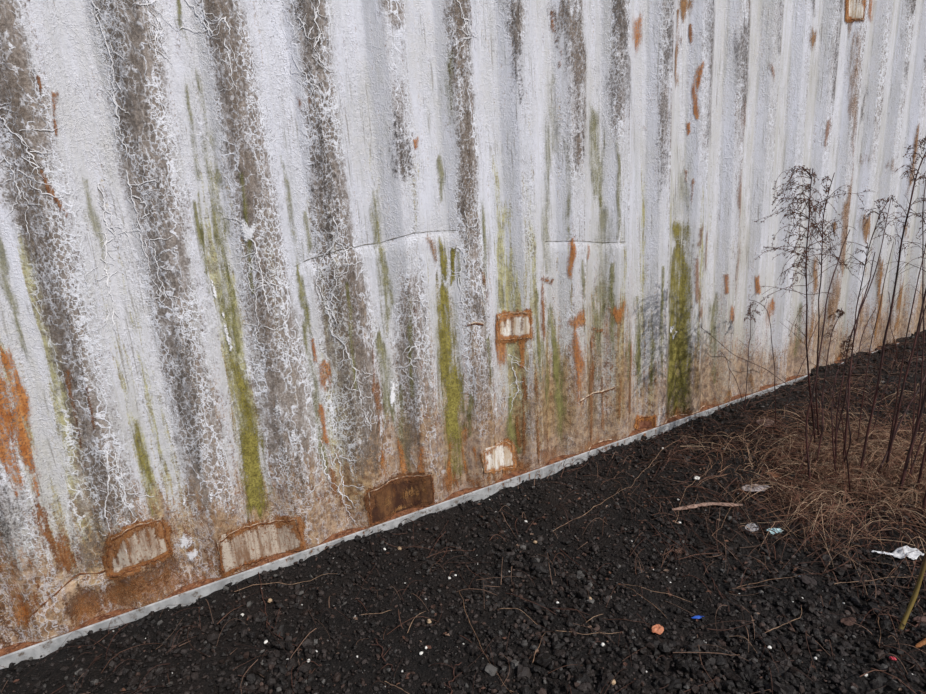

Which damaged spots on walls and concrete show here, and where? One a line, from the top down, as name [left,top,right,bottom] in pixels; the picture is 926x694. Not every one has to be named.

damp [0,45,87,443]
damp [194,193,229,272]
damp [206,0,286,391]
damp [294,0,394,476]
damp [439,237,461,285]
damp [446,0,478,244]
corrosion [686,62,704,135]
corrosion [845,0,872,148]
corrosion [0,346,81,573]
corrosion [363,276,554,533]
corrosion [568,311,755,440]
corrosion [63,515,312,632]